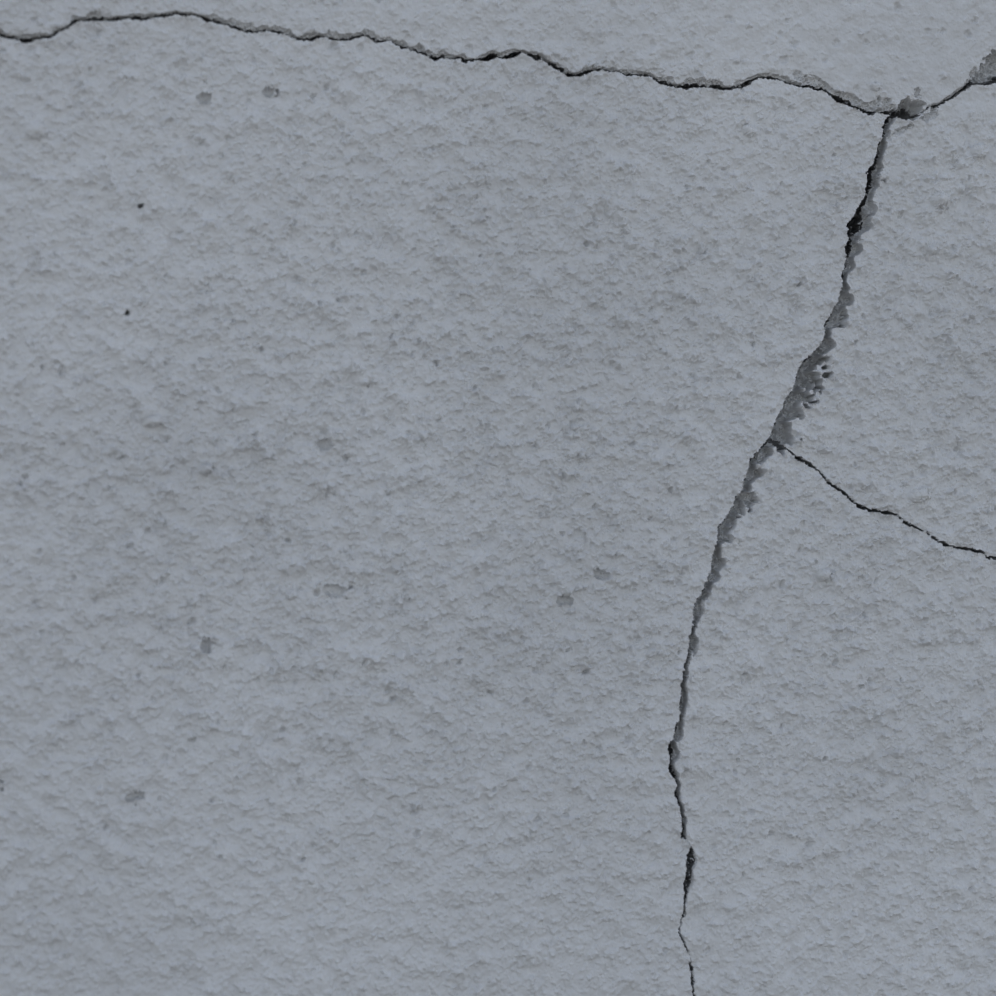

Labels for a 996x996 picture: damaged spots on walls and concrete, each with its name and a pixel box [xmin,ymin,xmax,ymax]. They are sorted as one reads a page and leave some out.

crack [0,8,898,118]
crack [925,65,996,111]
crack [665,116,996,996]